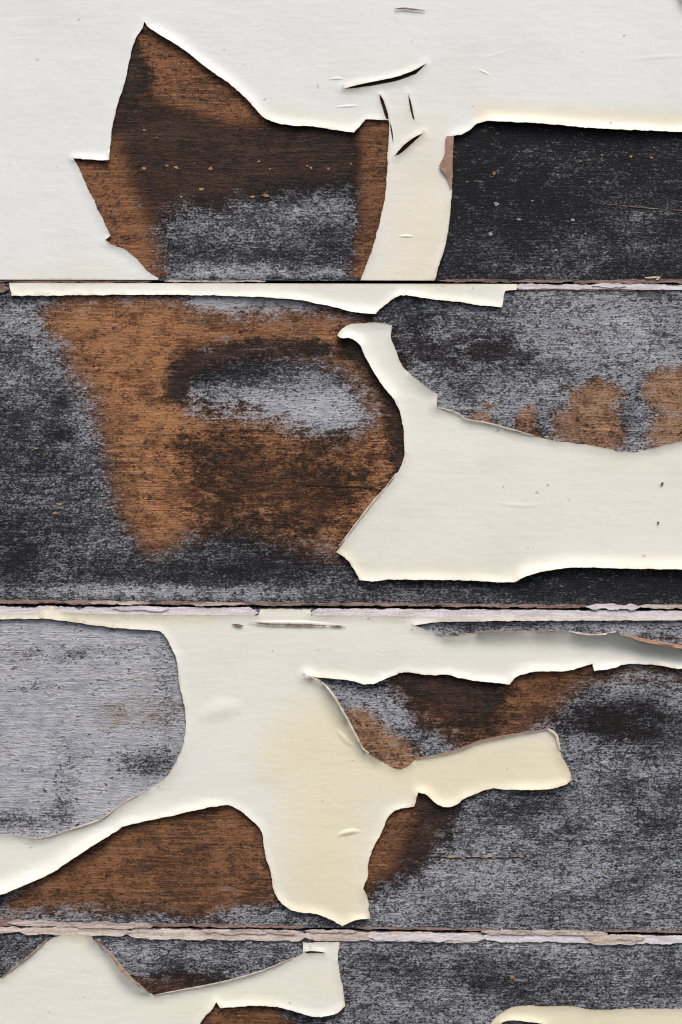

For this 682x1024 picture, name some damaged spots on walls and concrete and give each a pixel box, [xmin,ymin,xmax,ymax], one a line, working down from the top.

peeling [0,0,682,290]
crack [346,64,425,155]
peeling [0,280,682,1024]